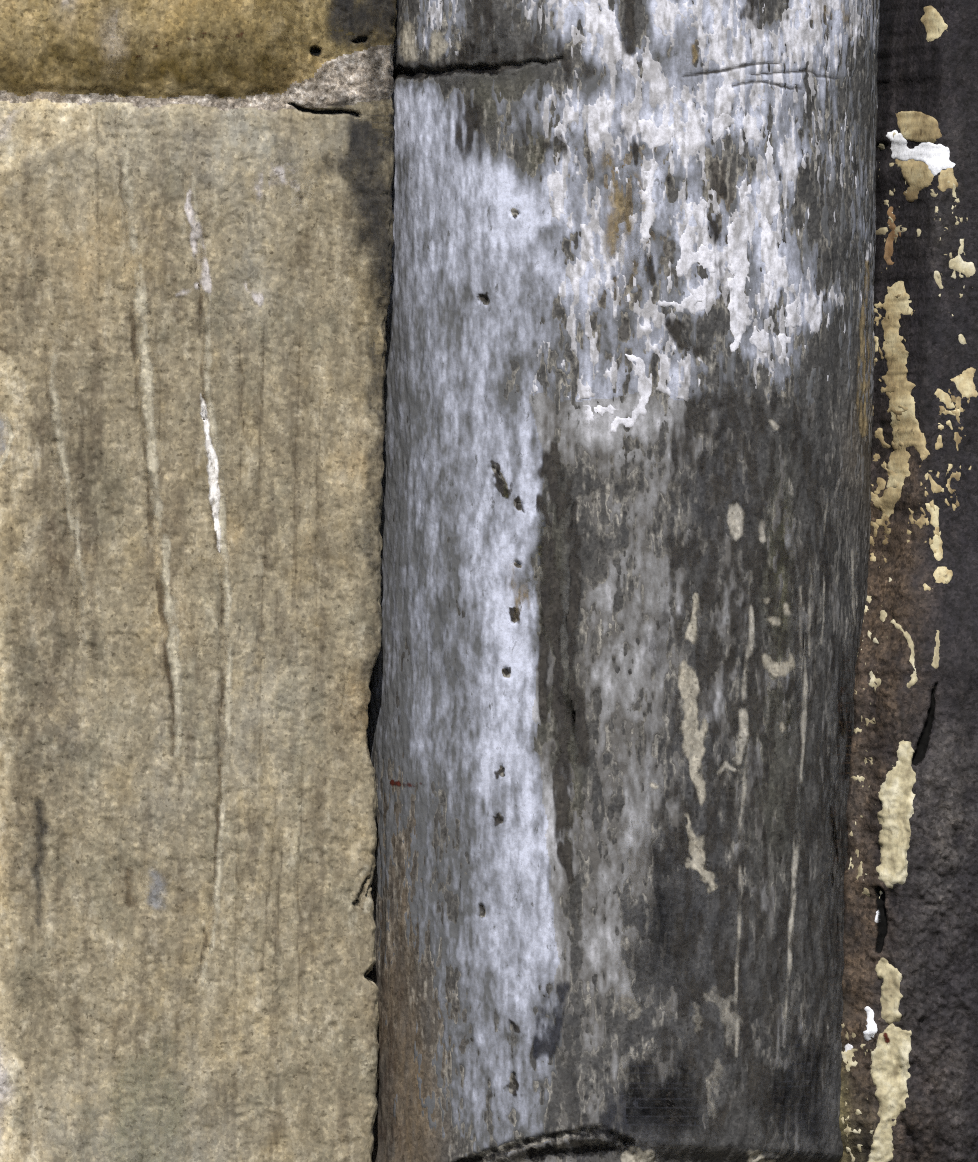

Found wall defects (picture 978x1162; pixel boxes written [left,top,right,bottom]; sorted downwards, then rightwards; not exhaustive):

water stain [623,0,636,54]
crack [392,57,562,79]
water stain [456,93,482,156]
water stain [709,220,719,243]
water stain [645,255,655,285]
water stain [665,318,704,357]
water stain [673,385,776,518]
peeling [353,0,978,1162]
water stain [516,443,589,885]
water stain [606,407,854,1139]
water stain [533,983,569,1059]
crack [457,1128,635,1162]